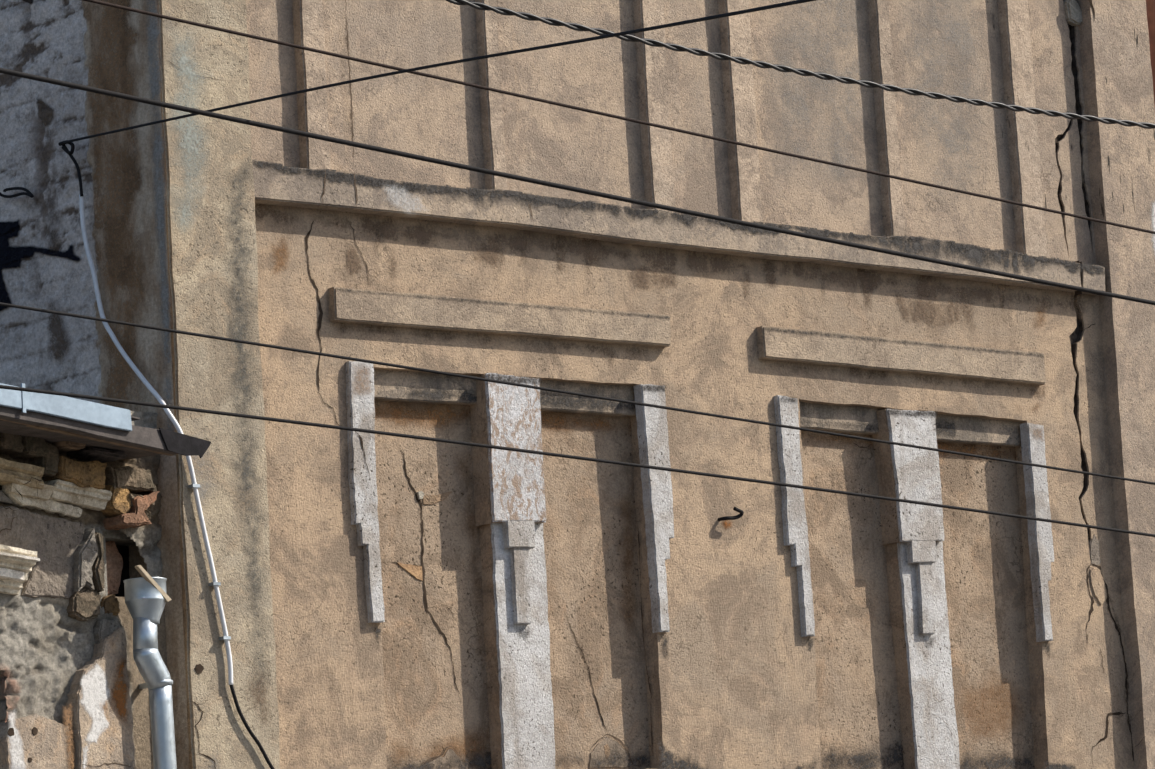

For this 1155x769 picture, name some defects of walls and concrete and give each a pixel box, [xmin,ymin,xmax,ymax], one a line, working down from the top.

crack [345,0,369,284]
damp [255,203,294,222]
crack [305,171,370,475]
damp [477,234,748,295]
damp [764,262,1004,323]
crack [1055,0,1146,761]
crack [382,452,460,694]
peeling [9,713,25,769]
peeling [81,664,109,769]
crack [565,614,607,731]